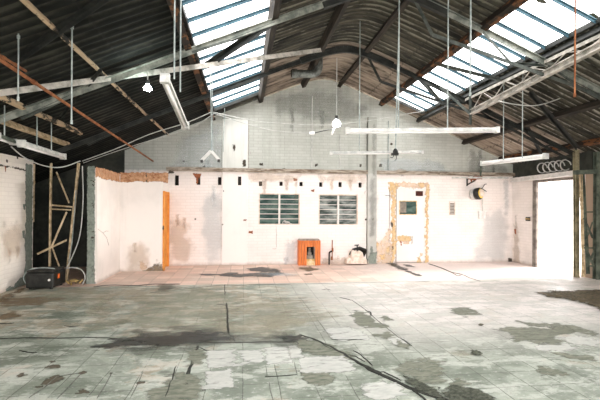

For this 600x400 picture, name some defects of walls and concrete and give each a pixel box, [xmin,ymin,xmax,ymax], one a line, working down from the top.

spalling [86,166,179,284]
peeling [376,181,429,263]
crack [0,323,139,353]
crack [151,283,446,400]